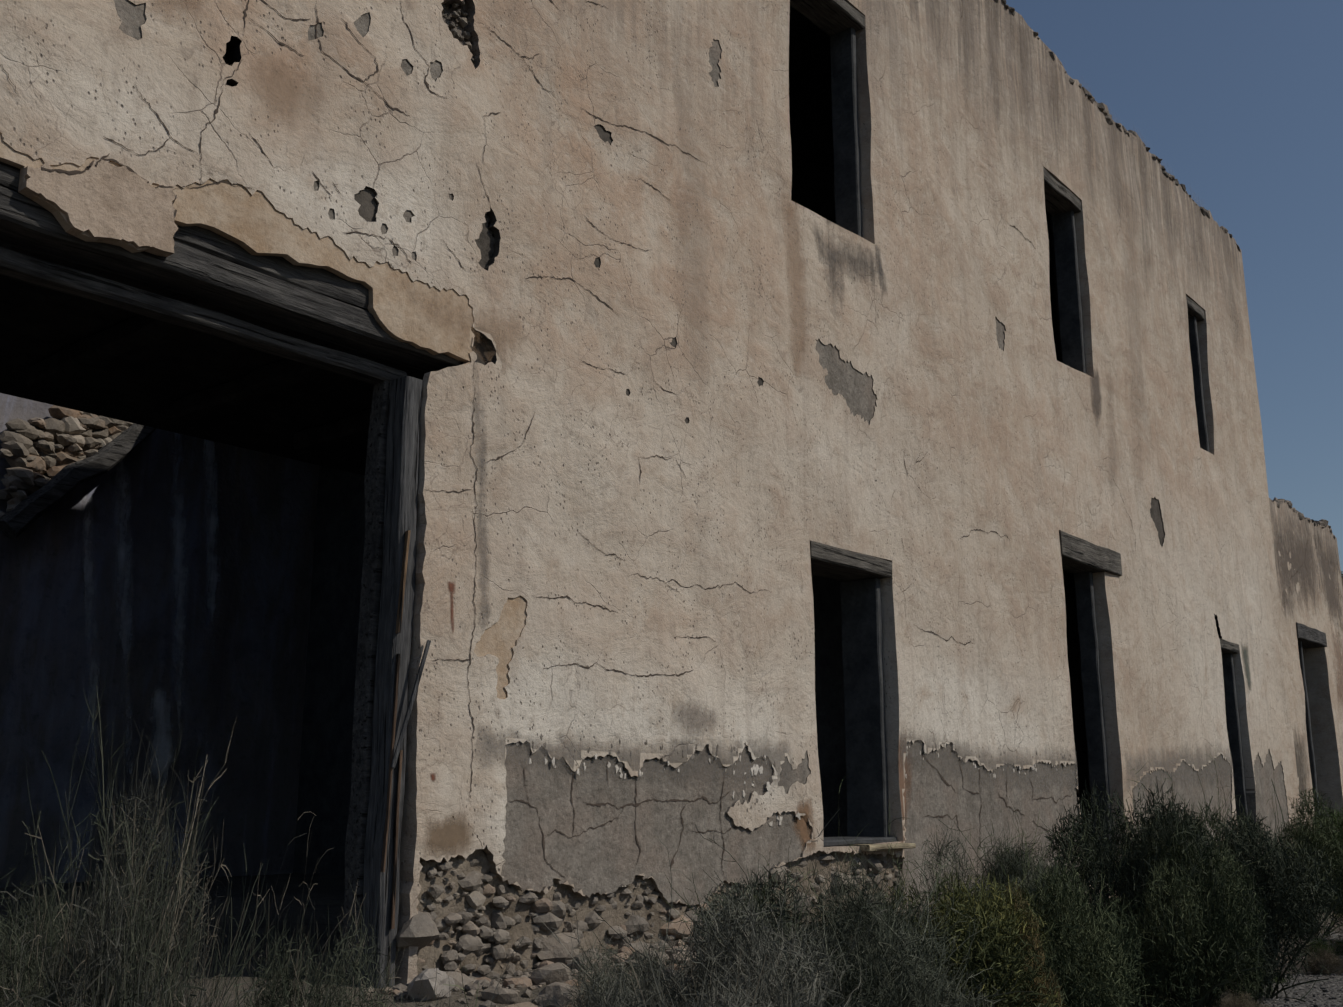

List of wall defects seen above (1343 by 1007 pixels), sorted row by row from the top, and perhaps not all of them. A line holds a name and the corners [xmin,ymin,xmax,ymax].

spalling [222,36,242,86]
crack [41,0,445,217]
spalling [441,0,480,69]
crack [488,28,700,161]
peeling [151,178,497,365]
spalling [475,207,501,271]
leakage [818,236,884,288]
crack [423,362,535,797]
crack [544,662,693,677]
crack [511,761,739,878]
spalling [485,733,813,905]
spalling [900,740,1083,913]